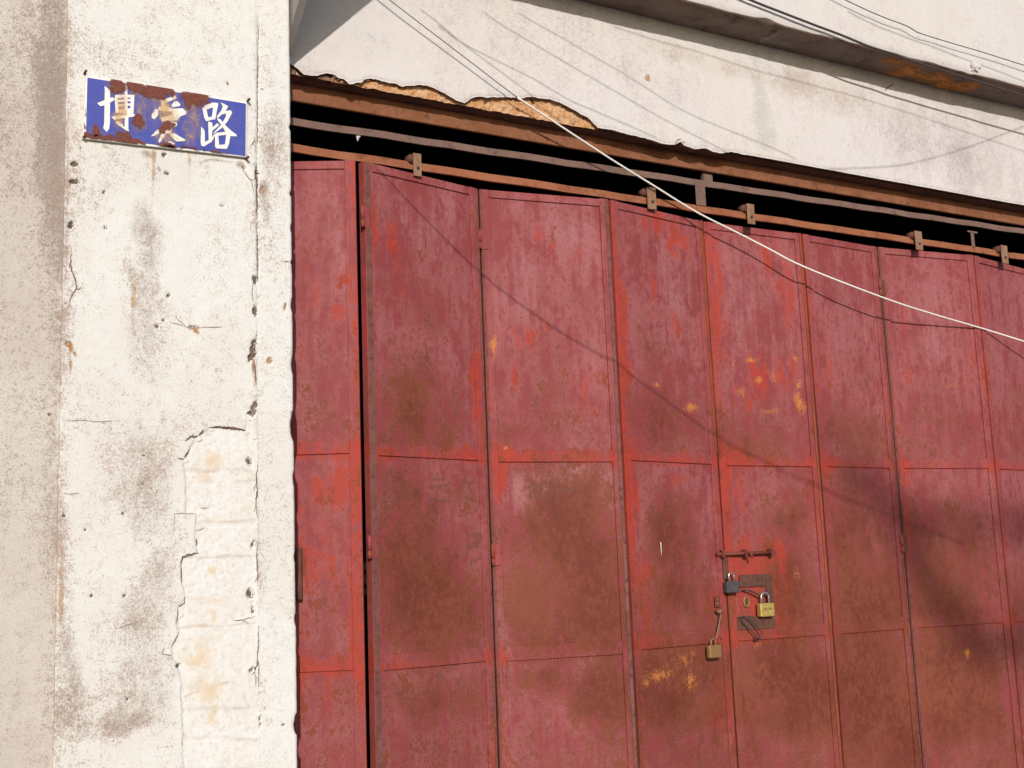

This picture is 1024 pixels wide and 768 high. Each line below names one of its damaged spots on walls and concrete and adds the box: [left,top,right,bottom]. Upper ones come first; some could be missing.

spalling [290,66,598,130]
rust [881,59,980,92]
crack [69,252,80,303]
peeling [164,400,261,768]